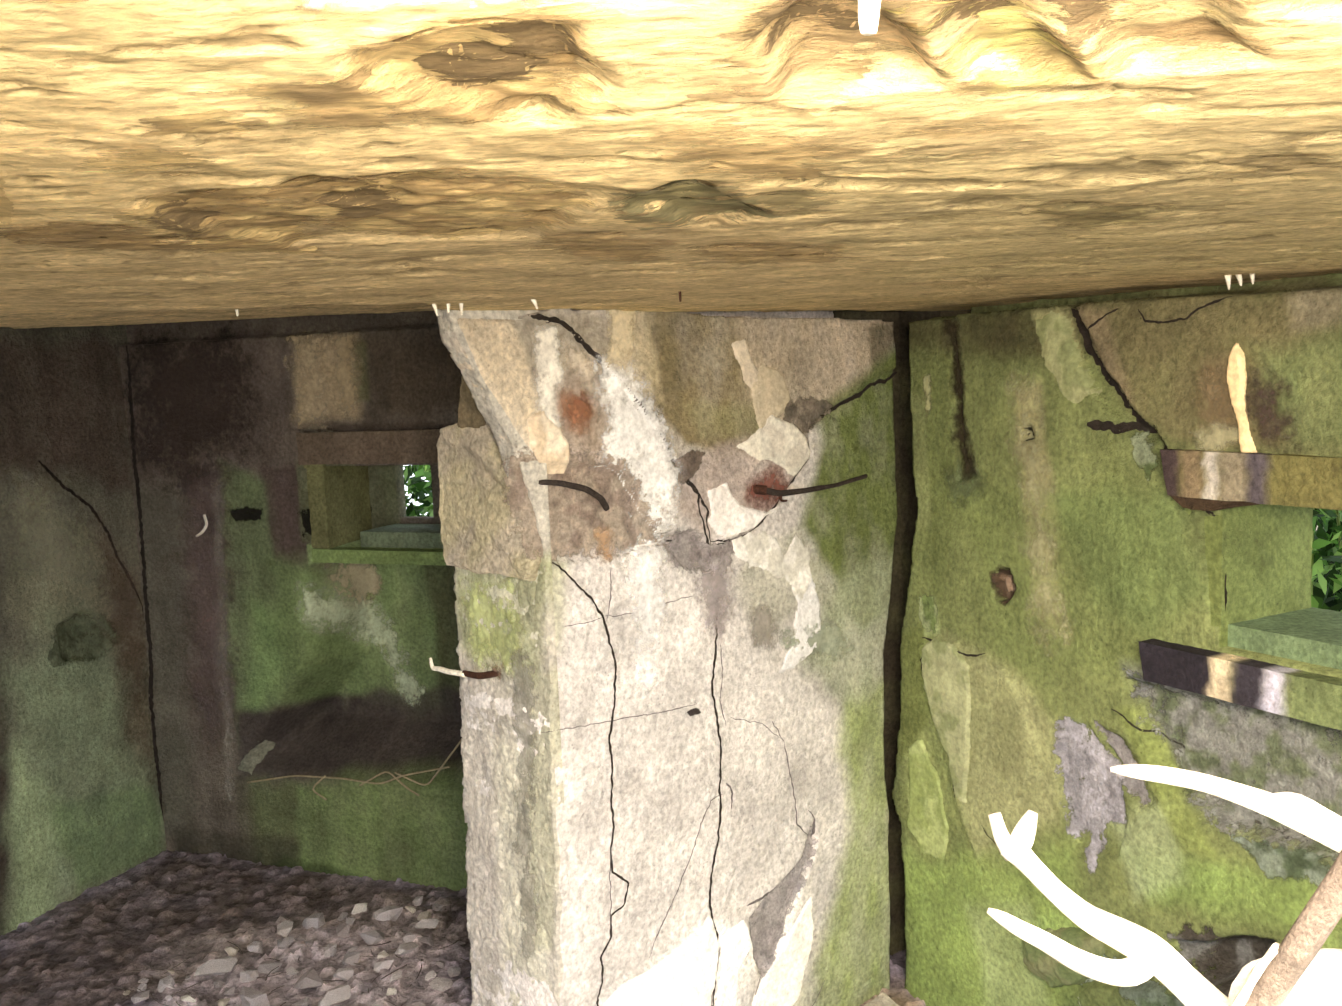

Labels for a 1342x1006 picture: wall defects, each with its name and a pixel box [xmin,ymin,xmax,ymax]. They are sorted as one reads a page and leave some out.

crack [38,346,163,816]
rust [558,393,591,434]
crack [527,313,644,407]
spalling [503,410,821,673]
rust [745,467,788,509]
peeling [731,339,833,476]
crack [1071,296,1232,449]
crack [1221,557,1229,610]
crack [541,372,897,1006]
spalling [1052,717,1151,872]
spalling [1123,668,1342,817]
peeling [603,826,818,1006]